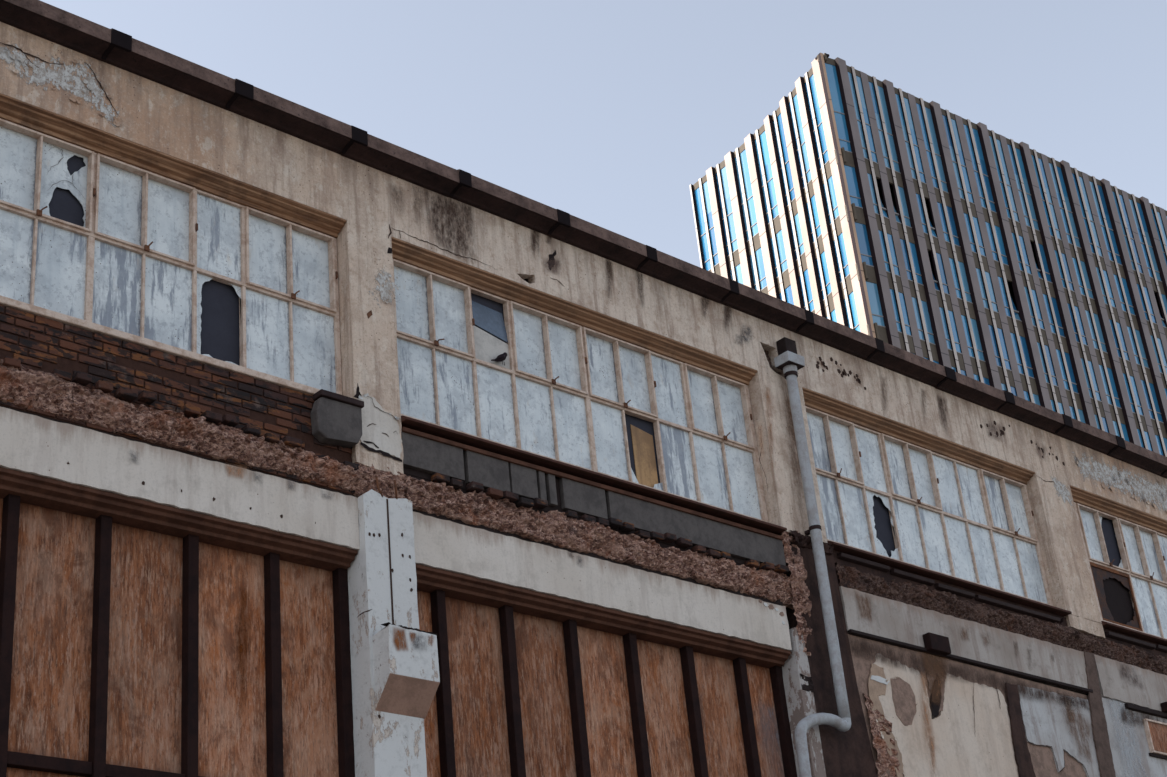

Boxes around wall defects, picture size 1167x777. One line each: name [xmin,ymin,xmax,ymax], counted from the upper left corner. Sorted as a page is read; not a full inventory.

peeling [0,39,124,126]
spalling [547,236,559,272]
spalling [0,357,1167,675]
spalling [800,674,815,692]
spalling [862,664,946,777]